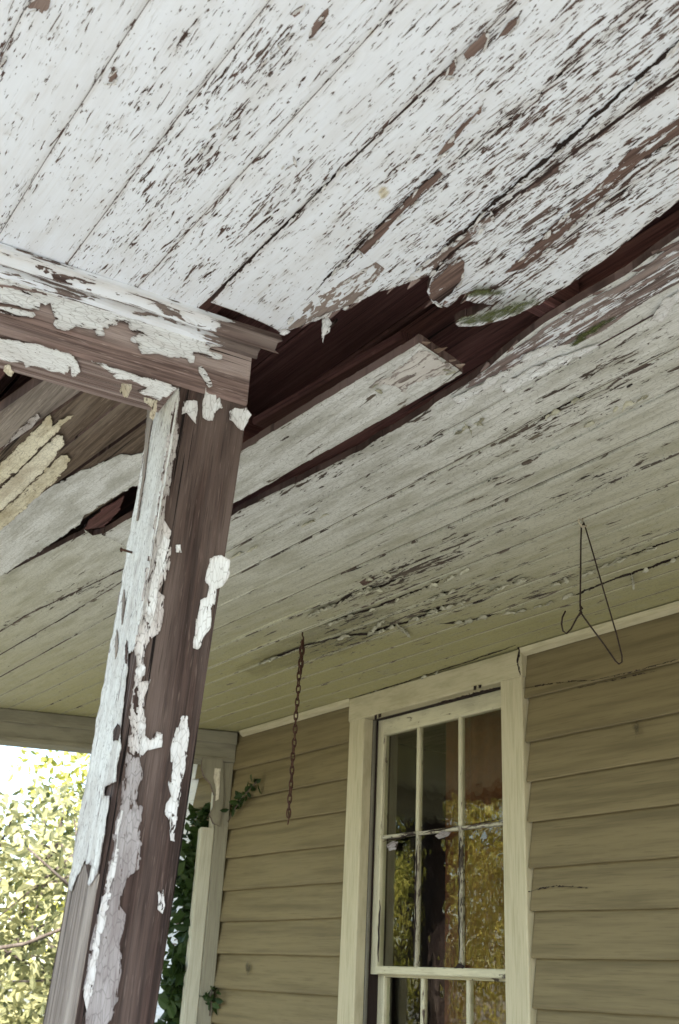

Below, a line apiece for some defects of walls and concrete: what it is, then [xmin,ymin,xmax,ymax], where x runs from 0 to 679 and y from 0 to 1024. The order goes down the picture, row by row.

peeling [23,0,50,13]
peeling [104,69,118,86]
peeling [307,8,329,41]
peeling [444,16,520,81]
peeling [280,102,495,341]
peeling [505,119,679,273]
peeling [452,242,679,404]
peeling [369,350,456,394]
crack [257,538,679,666]
peeling [0,277,251,1024]
crack [528,884,586,892]